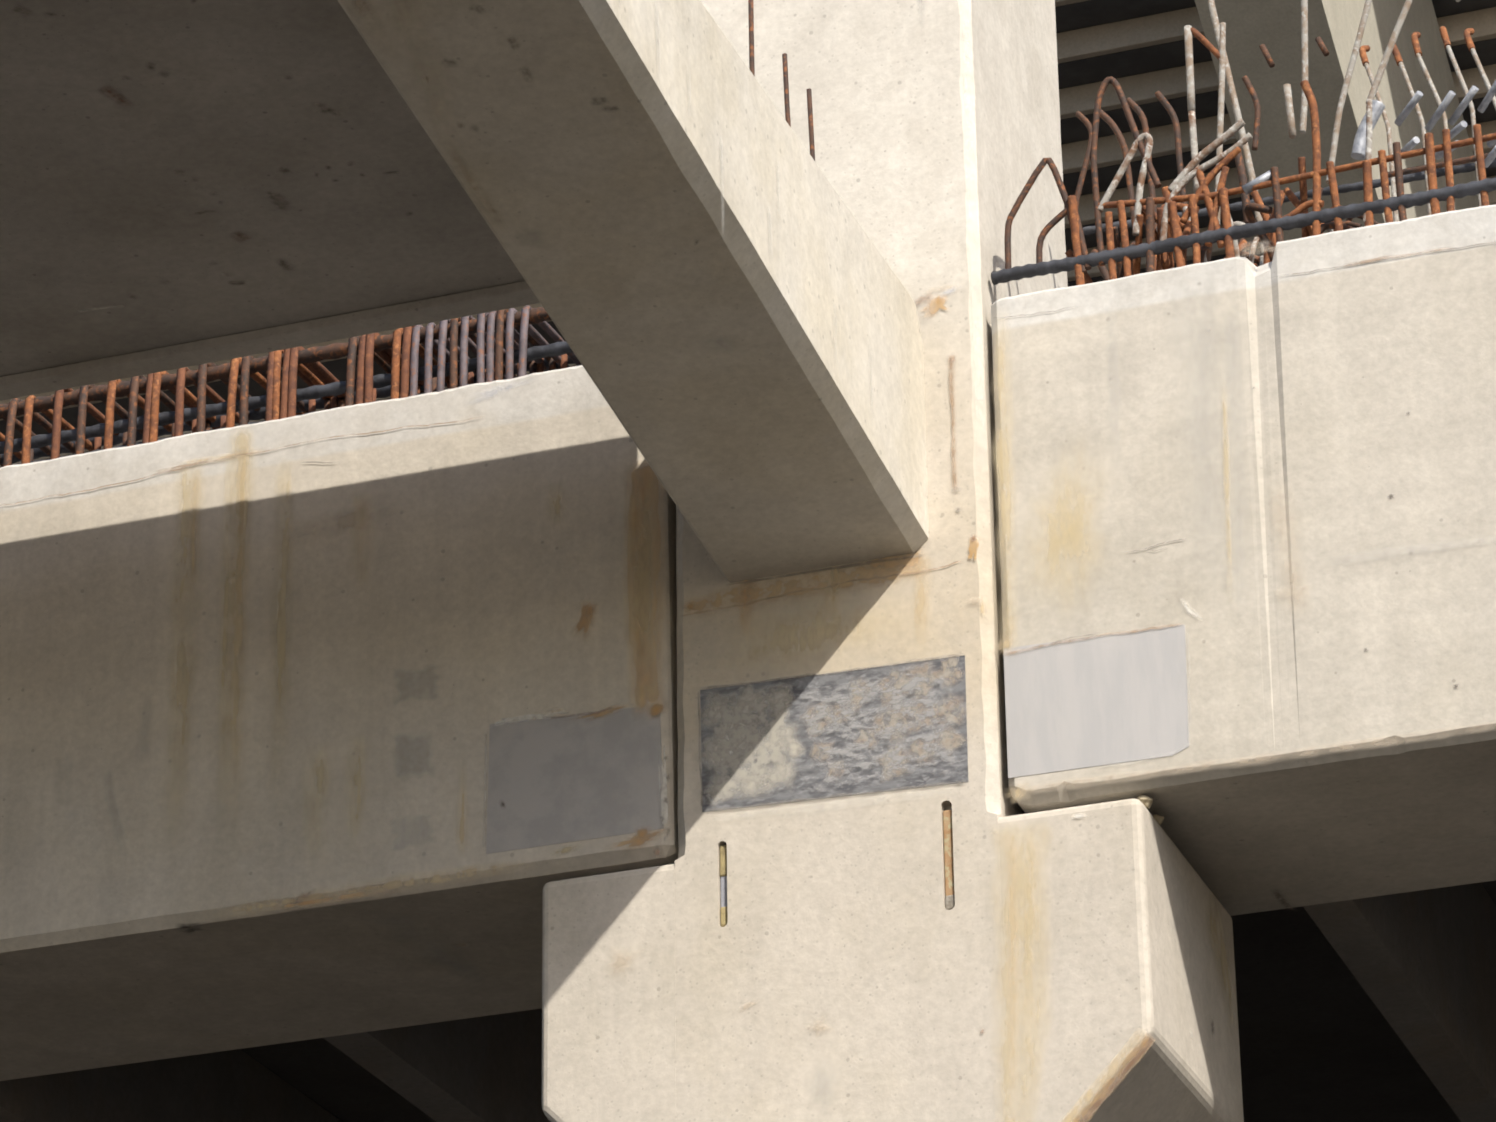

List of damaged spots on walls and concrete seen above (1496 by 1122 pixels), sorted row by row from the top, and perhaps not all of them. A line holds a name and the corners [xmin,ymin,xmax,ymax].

crack [15,421,456,504]
rust [688,536,979,609]